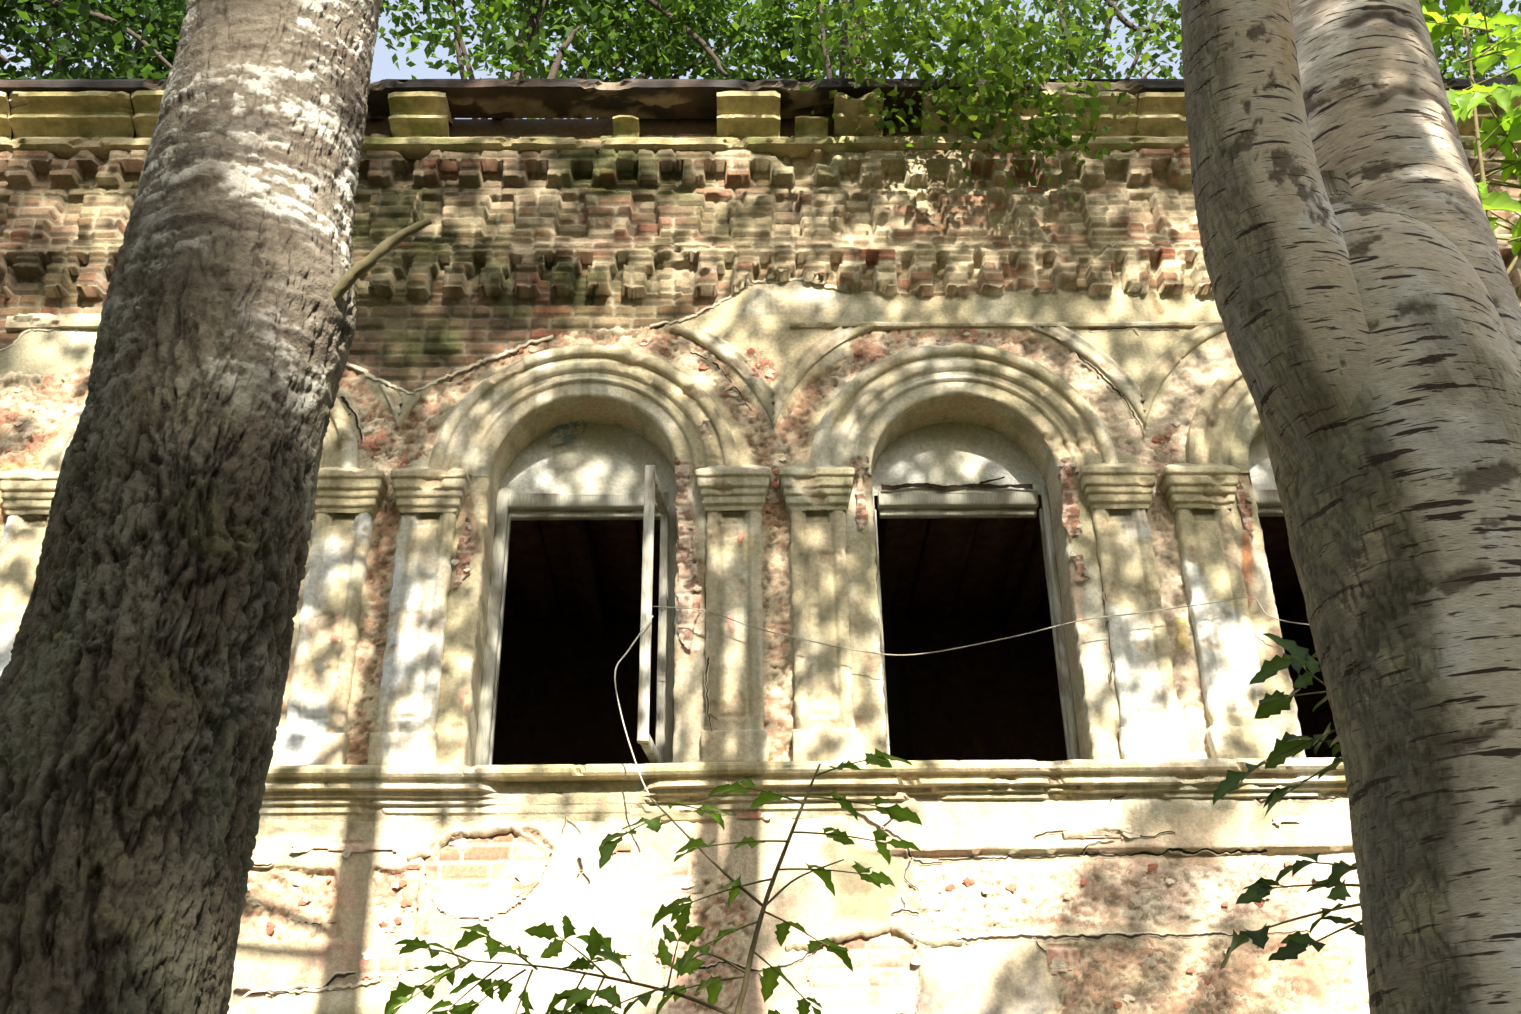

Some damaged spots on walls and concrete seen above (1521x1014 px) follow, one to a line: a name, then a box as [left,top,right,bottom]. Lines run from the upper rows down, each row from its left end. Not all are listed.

flaking render [0,371,76,472]
flaking render [357,412,408,512]
flaking render [1143,421,1180,479]
flaking render [674,457,702,649]
flaking render [242,824,552,990]
flaking render [786,859,1357,1014]
crack [840,793,1312,953]
crack [1250,795,1341,806]